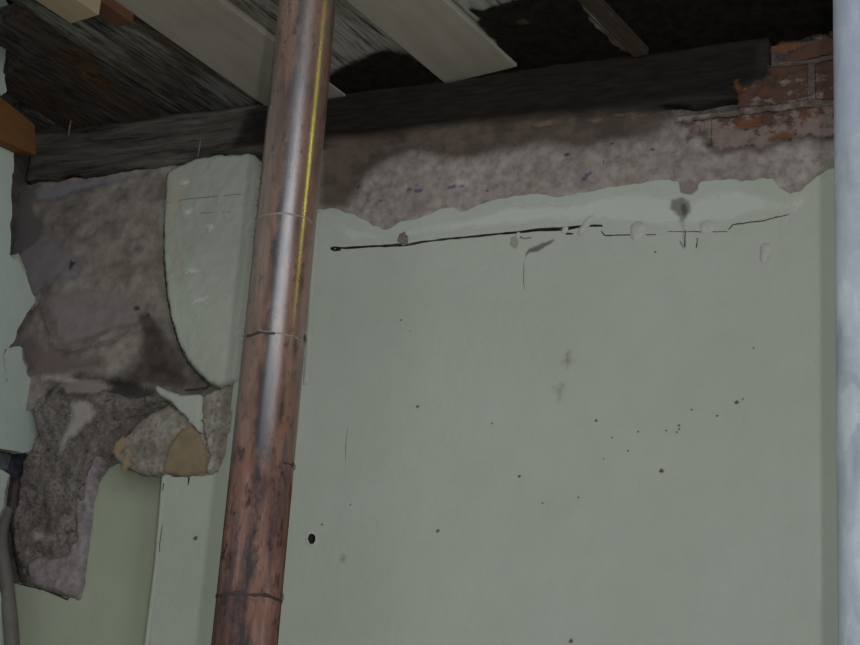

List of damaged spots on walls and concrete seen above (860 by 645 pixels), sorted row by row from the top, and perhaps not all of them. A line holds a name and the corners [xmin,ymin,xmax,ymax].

water stain [236,109,267,144]
crack [330,214,789,251]
spalling [318,32,834,246]
water stain [321,0,833,204]
water stain [672,199,689,218]
spalling [0,166,233,600]